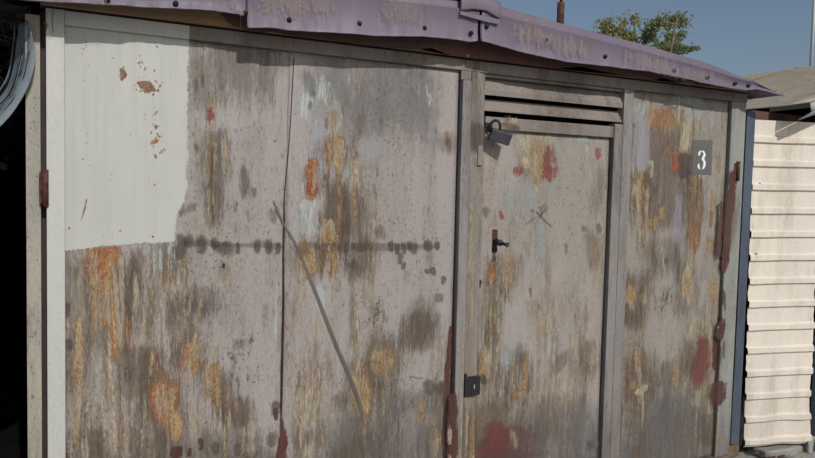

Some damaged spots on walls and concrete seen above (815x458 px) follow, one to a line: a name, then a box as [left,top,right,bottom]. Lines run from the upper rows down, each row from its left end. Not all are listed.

rust [133,55,161,95]
rust [72,245,139,449]
rust [296,100,357,305]
rust [388,240,439,254]
rust [427,326,453,458]
rust [461,255,530,458]
rust [629,103,736,306]
rust [688,316,727,408]